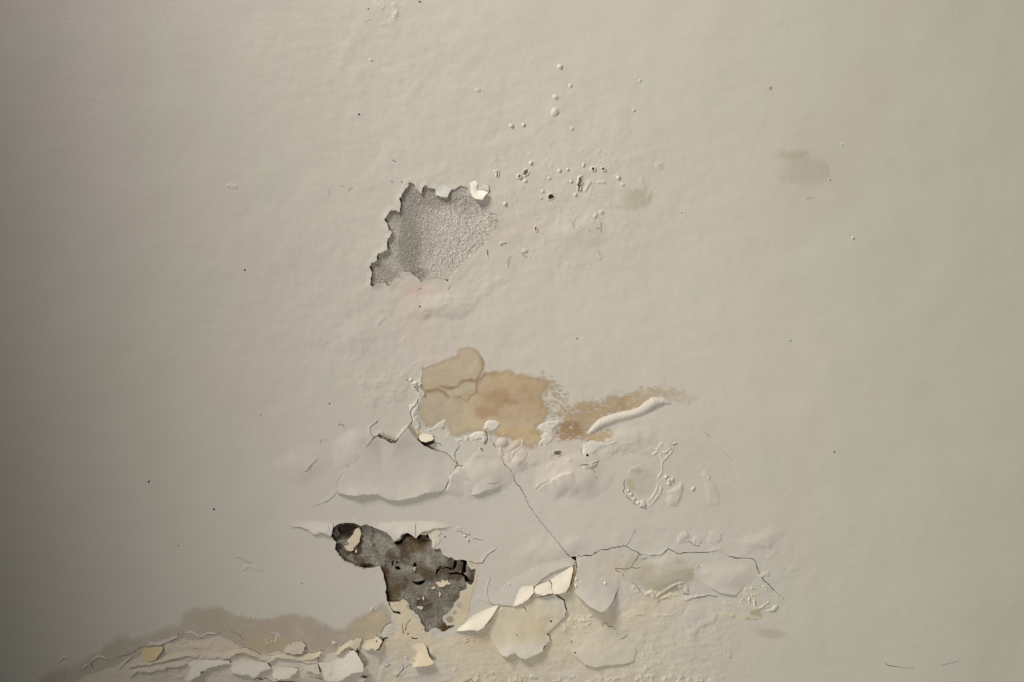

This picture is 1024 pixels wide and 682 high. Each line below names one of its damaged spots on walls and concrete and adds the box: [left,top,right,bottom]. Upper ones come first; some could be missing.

flaking render [364,177,505,293]
crack [304,398,419,472]
leakage [419,348,660,448]
spalling [77,518,761,682]
crack [470,547,497,606]
crack [440,443,778,594]